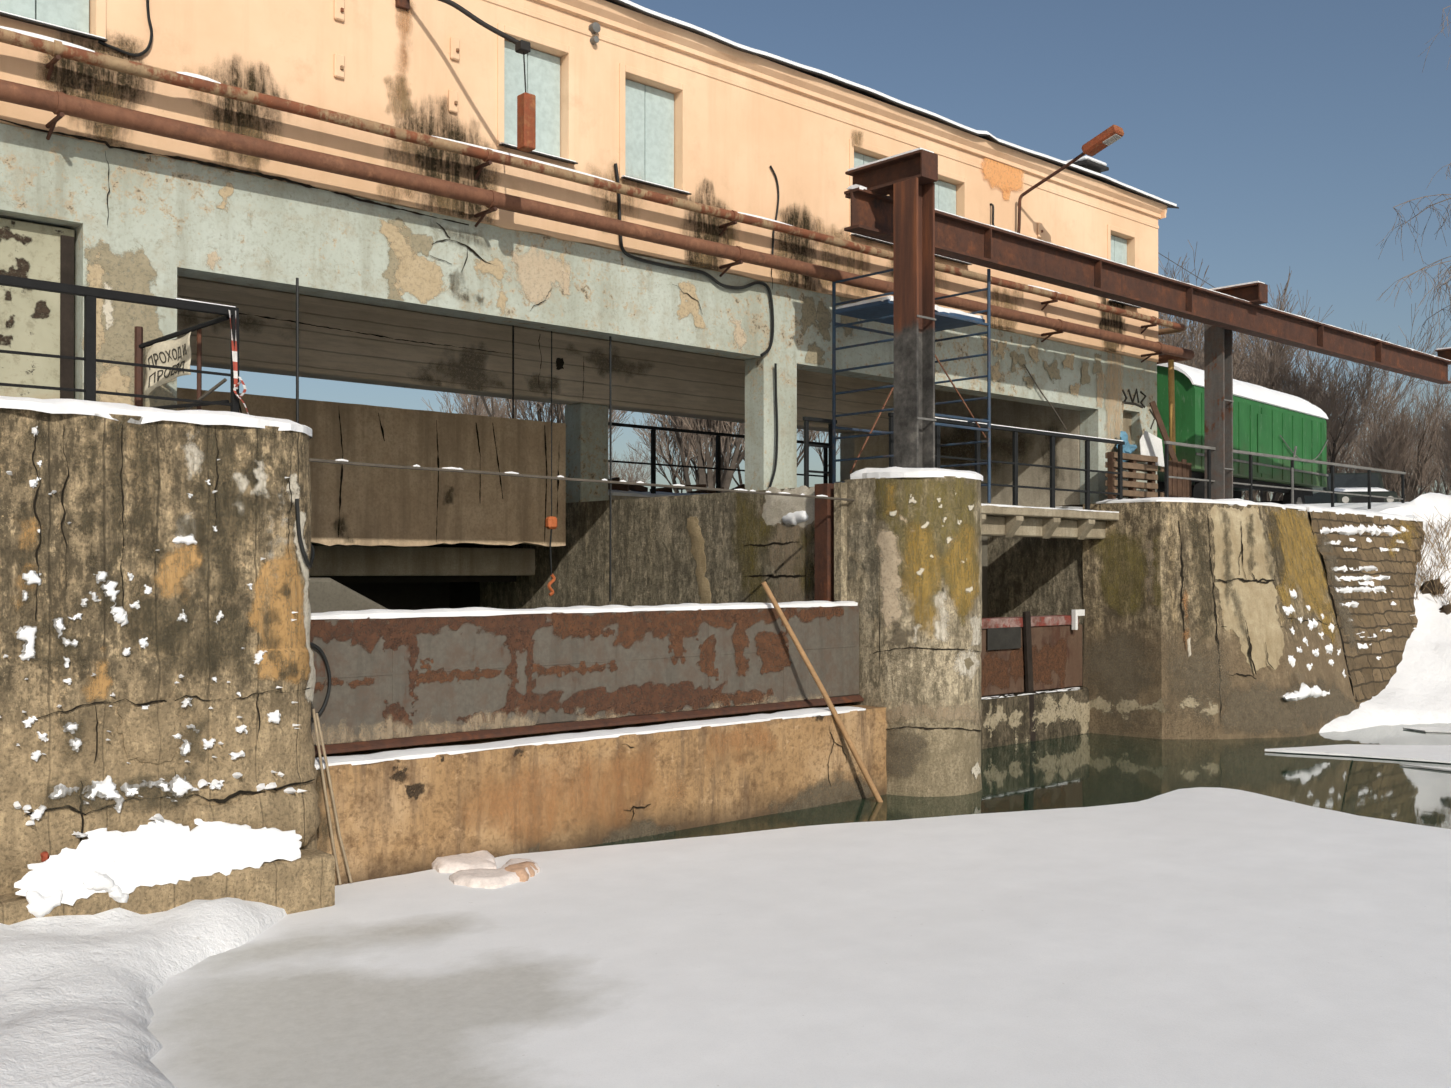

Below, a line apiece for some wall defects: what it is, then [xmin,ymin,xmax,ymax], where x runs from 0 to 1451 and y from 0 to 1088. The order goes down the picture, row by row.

leakage [44,37,145,107]
leakage [214,60,279,140]
rust [389,9,413,113]
leakage [393,102,496,242]
flaking render [82,239,177,411]
flaking render [379,218,446,304]
flaking render [473,247,570,316]
flaking render [677,281,706,329]
leakage [84,415,310,684]
rust [310,606,844,738]
crack [1178,514,1360,724]
crack [23,688,315,842]